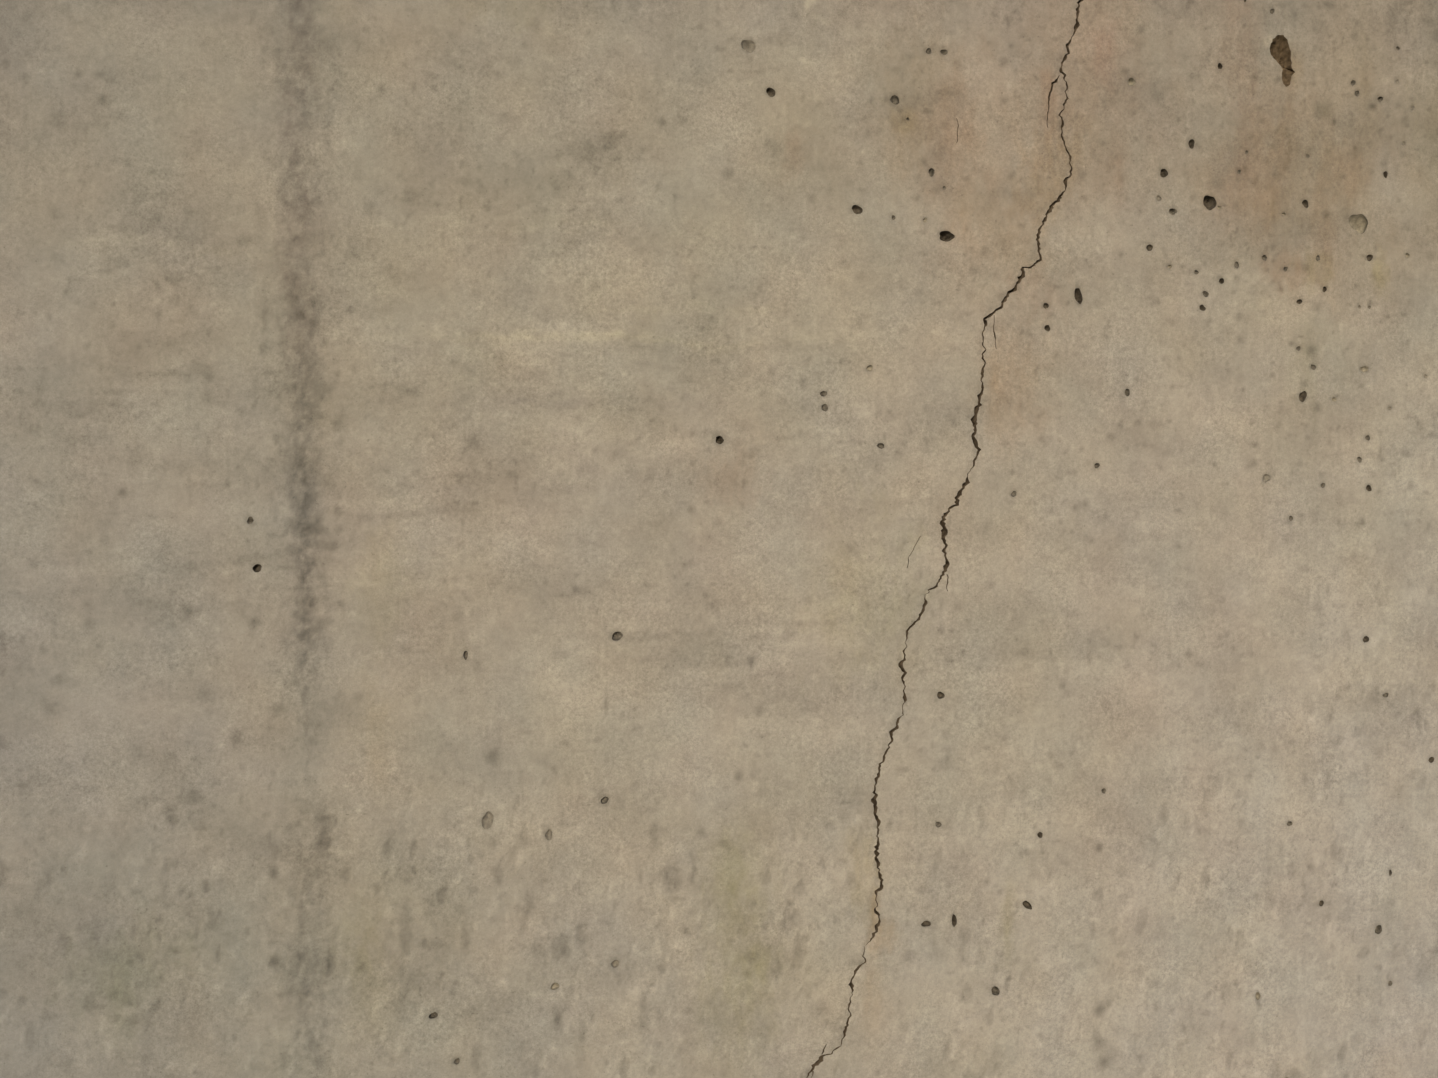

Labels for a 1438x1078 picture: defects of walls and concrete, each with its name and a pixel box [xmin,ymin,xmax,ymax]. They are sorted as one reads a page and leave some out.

crack [801,0,1093,1078]